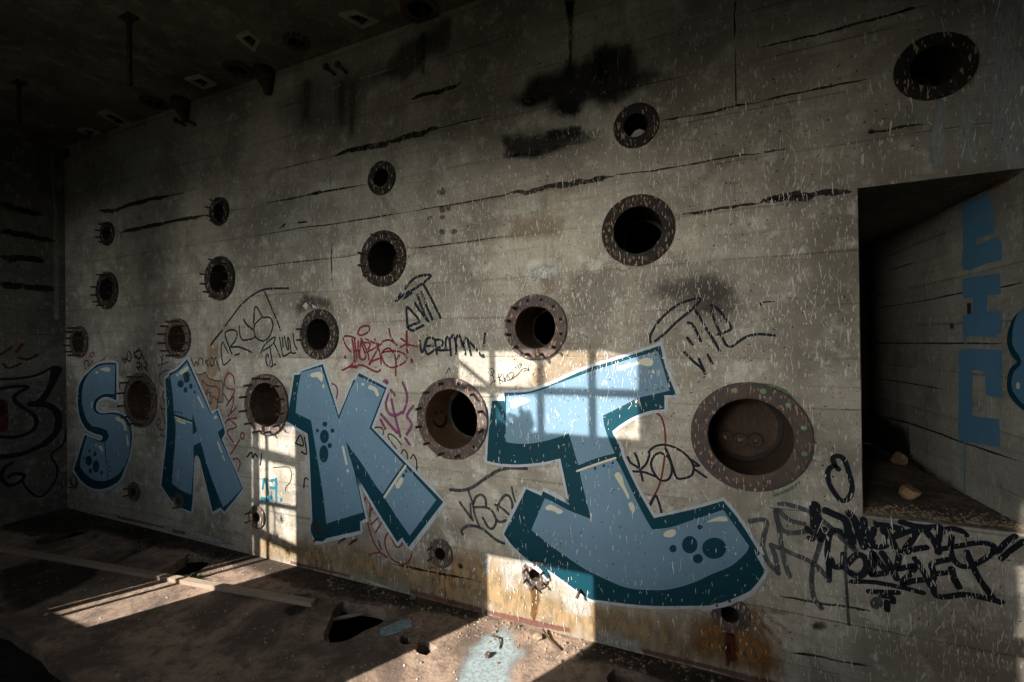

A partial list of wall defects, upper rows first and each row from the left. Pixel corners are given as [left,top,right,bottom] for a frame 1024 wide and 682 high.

leakage [503,1,655,157]
crack [250,115,785,287]
crack [679,188,852,215]